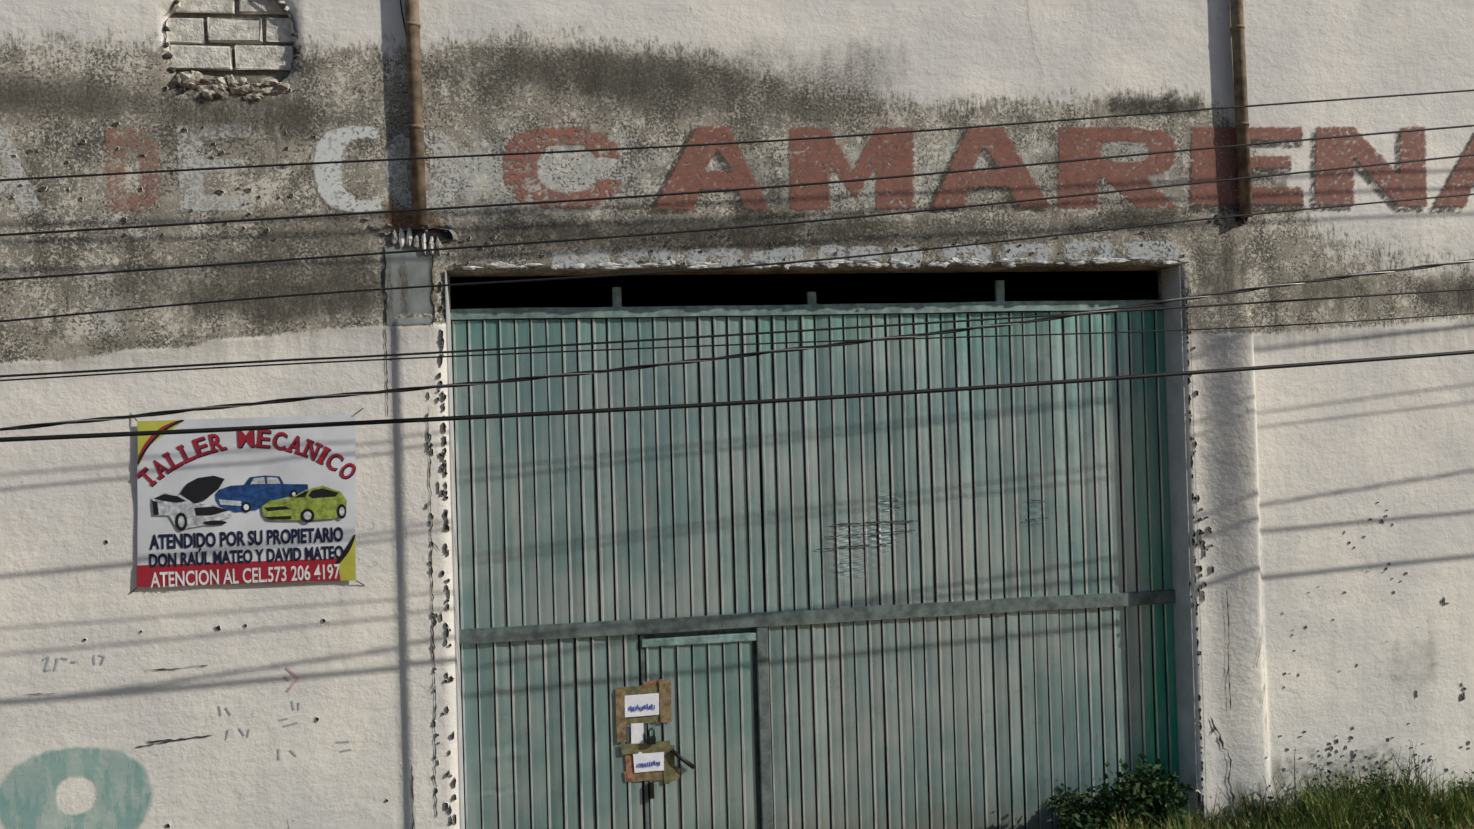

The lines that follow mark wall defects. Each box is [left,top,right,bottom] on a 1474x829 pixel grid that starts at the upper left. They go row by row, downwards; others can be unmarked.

spalling [163,26,292,101]
mould [1111,93,1200,116]